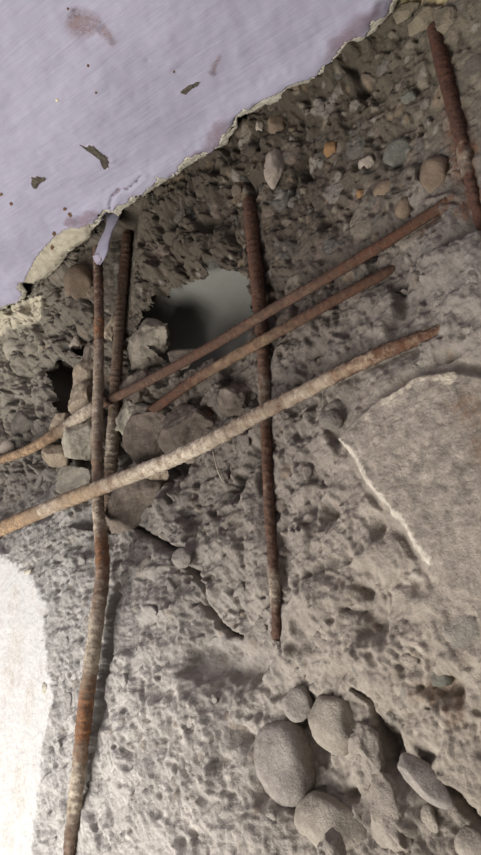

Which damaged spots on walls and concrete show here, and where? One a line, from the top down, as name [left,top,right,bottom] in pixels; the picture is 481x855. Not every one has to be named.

peeling [30,175,47,190]
spalling [68,0,481,483]
spalling [0,190,481,855]